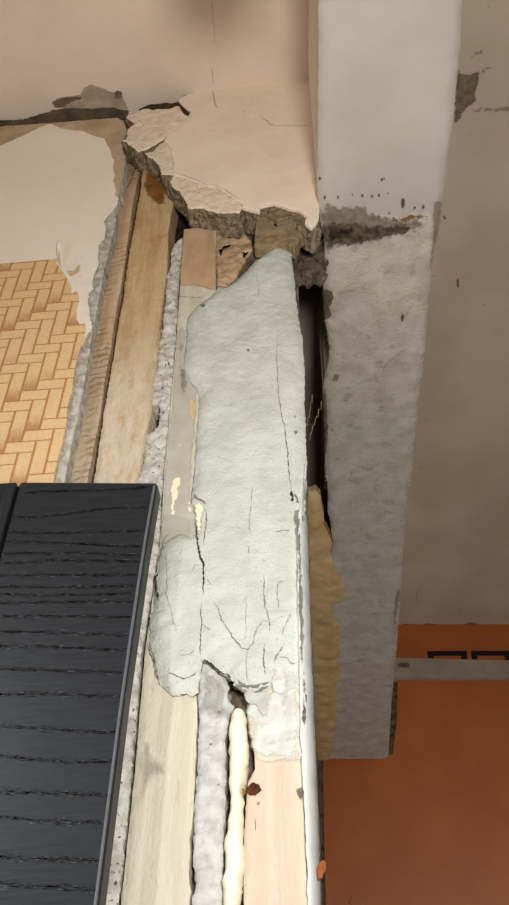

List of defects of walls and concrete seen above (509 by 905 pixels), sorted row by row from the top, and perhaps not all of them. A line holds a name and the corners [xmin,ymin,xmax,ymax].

flaking render [52,85,243,217]
leakage [322,193,424,248]
leakage [432,201,441,253]
crack [276,351,299,504]
crack [149,494,296,693]